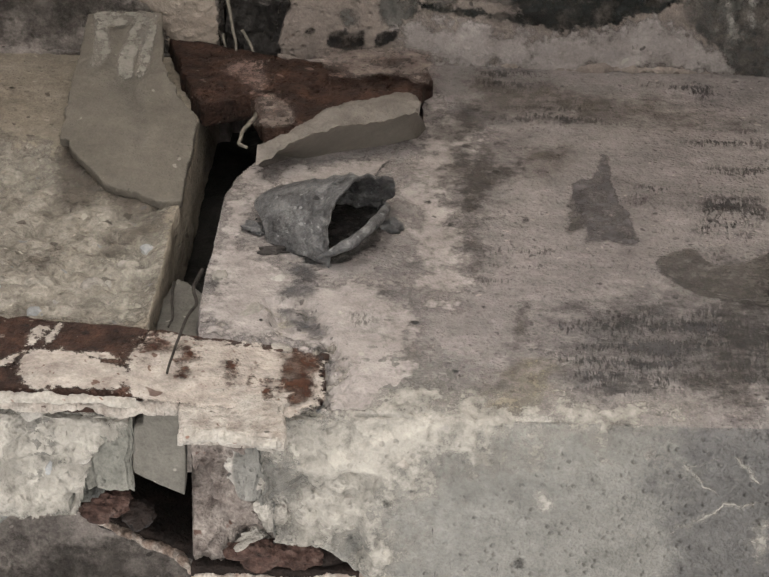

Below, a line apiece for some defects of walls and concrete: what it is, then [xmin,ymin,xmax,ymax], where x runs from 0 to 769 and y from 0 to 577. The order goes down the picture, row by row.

leakage [419,2,541,26]
rust [223,59,276,98]
leakage [435,105,524,209]
spalling [0,133,348,418]
rust [131,332,203,378]
rust [223,359,239,386]
rust [247,351,320,404]